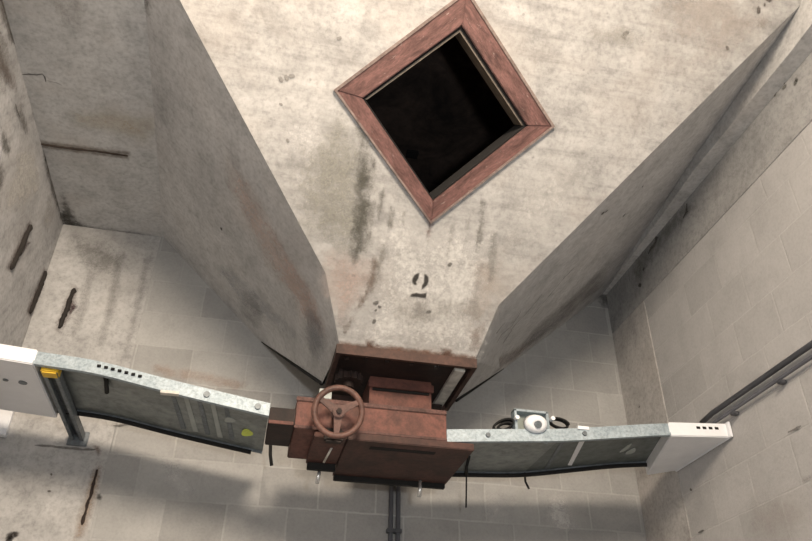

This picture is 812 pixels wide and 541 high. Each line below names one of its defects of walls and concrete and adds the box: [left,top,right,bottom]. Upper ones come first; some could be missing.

damp [308,132,370,257]